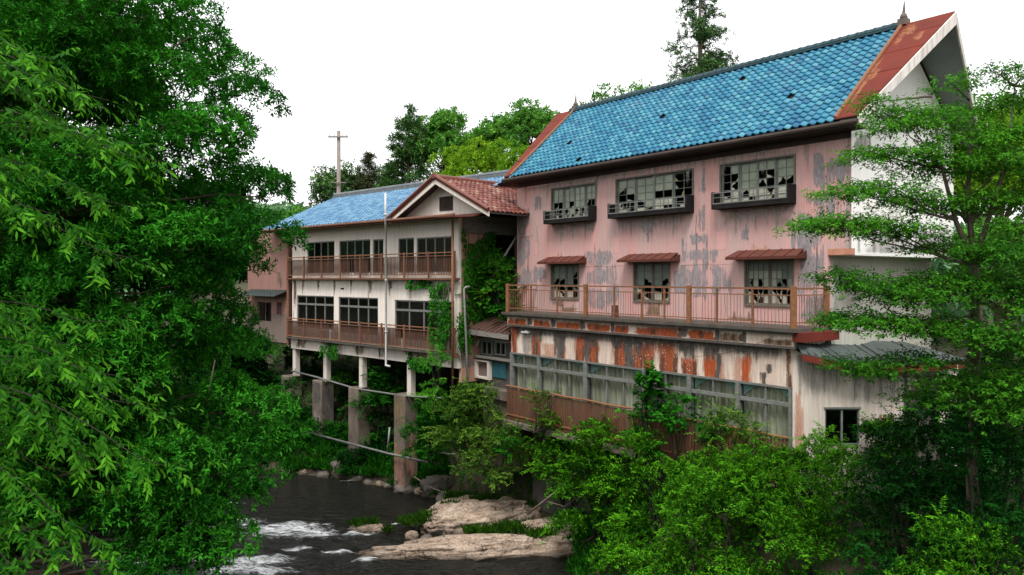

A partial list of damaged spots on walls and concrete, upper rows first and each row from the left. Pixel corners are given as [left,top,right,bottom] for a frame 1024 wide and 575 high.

corrosion [894,25,923,45]
peeling [584,243,619,309]
peeling [674,169,731,299]
peeling [791,152,850,324]
corrosion [508,300,751,382]
damp [795,355,840,448]